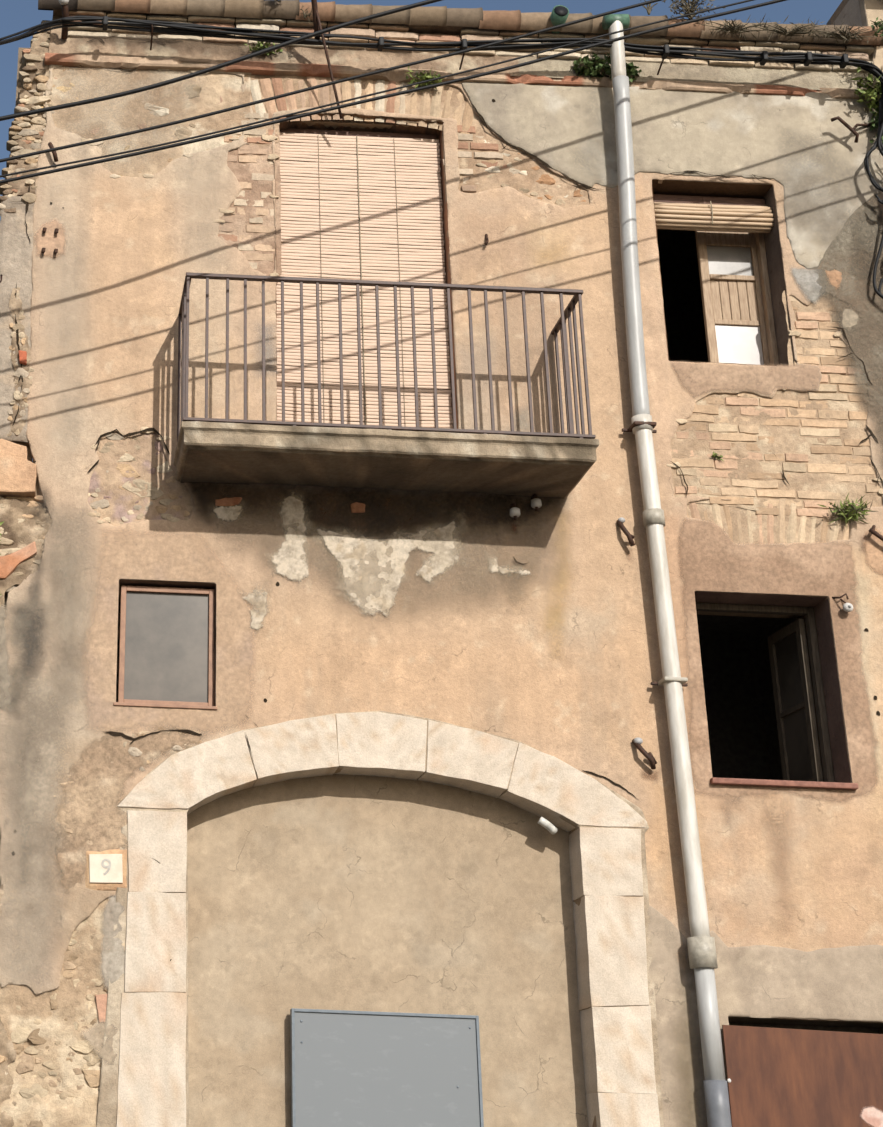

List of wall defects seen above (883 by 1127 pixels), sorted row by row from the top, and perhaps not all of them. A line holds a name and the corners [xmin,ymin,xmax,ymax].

peeling [0,20,590,285]
flaking render [6,287,34,437]
flaking render [667,289,883,544]
water stain [801,146,883,445]
crack [833,327,872,385]
crack [859,425,883,486]
flaking render [0,495,52,609]
peeling [242,492,461,630]
crack [106,729,202,745]
flaking render [0,1018,23,1127]